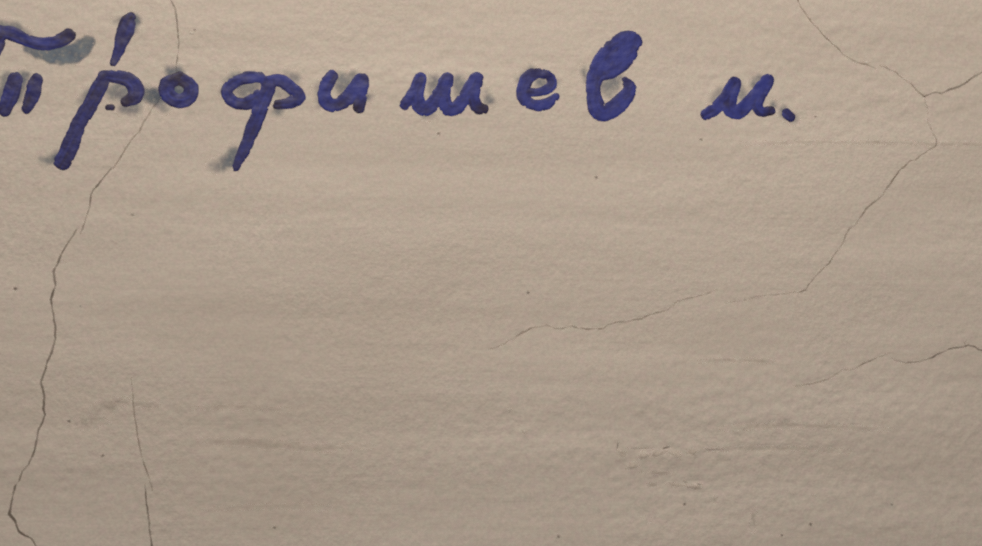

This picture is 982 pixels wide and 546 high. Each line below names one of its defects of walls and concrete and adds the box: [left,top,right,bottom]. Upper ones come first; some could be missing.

crack [8,479,32,539]